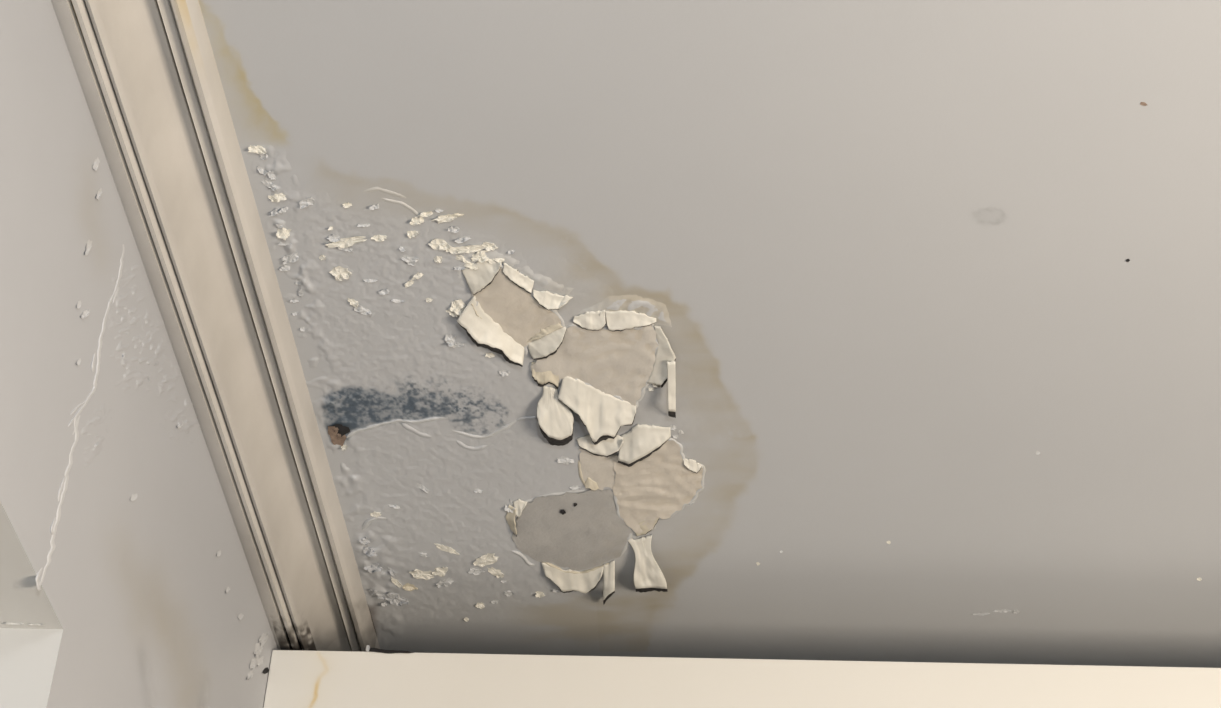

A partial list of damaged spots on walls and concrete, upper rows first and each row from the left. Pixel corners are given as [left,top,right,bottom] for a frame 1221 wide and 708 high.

crack [35,244,125,590]
leakage [328,393,537,451]
peeling [457,251,706,604]